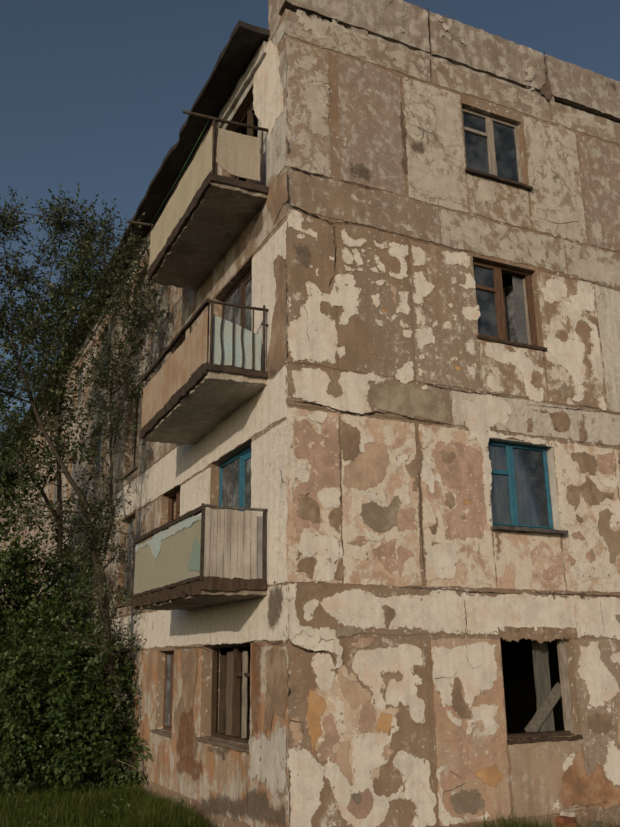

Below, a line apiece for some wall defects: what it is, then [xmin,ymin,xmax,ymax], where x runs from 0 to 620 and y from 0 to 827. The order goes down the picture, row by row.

peeling [294,9,381,52]
peeling [253,40,284,141]
peeling [300,75,330,140]
peeling [527,126,548,188]
flaking render [266,171,317,239]
peeling [248,208,620,827]
flaking render [174,648,197,749]
leakage [199,789,285,826]